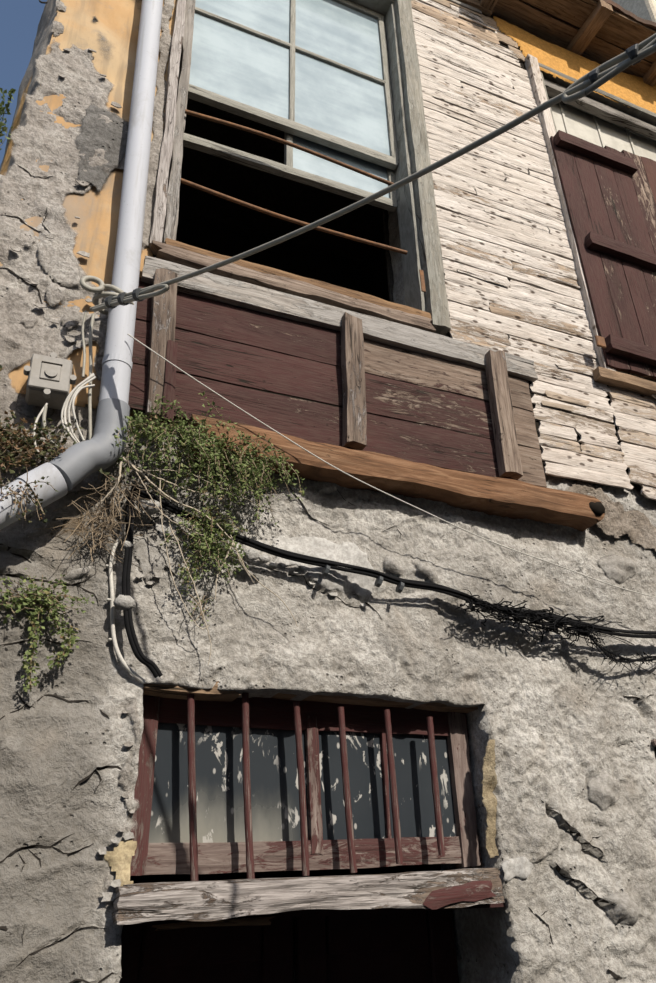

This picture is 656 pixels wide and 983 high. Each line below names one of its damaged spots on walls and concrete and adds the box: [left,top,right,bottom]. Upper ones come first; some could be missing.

flaking render [0,0,129,488]
flaking render [67,470,104,494]
flaking render [565,480,656,551]
crack [0,833,94,872]
crack [71,762,123,792]
flaking render [98,699,140,907]
crack [540,799,607,861]
crack [546,859,615,907]